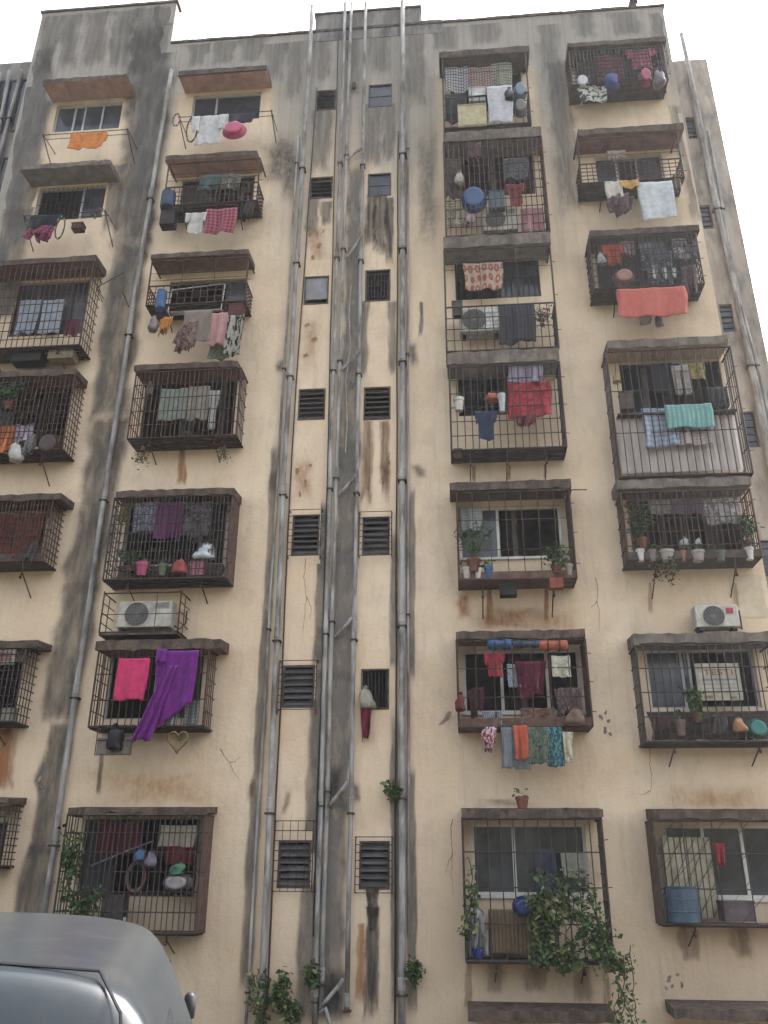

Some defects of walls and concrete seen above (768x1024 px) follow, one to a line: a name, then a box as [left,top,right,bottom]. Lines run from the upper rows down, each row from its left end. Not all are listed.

leakage [0,51,51,260]
leakage [16,29,170,913]
corrosion [364,421,389,492]
leakage [295,171,394,1021]
leakage [390,495,415,663]
leakage [390,731,415,810]
leakage [364,801,417,1013]